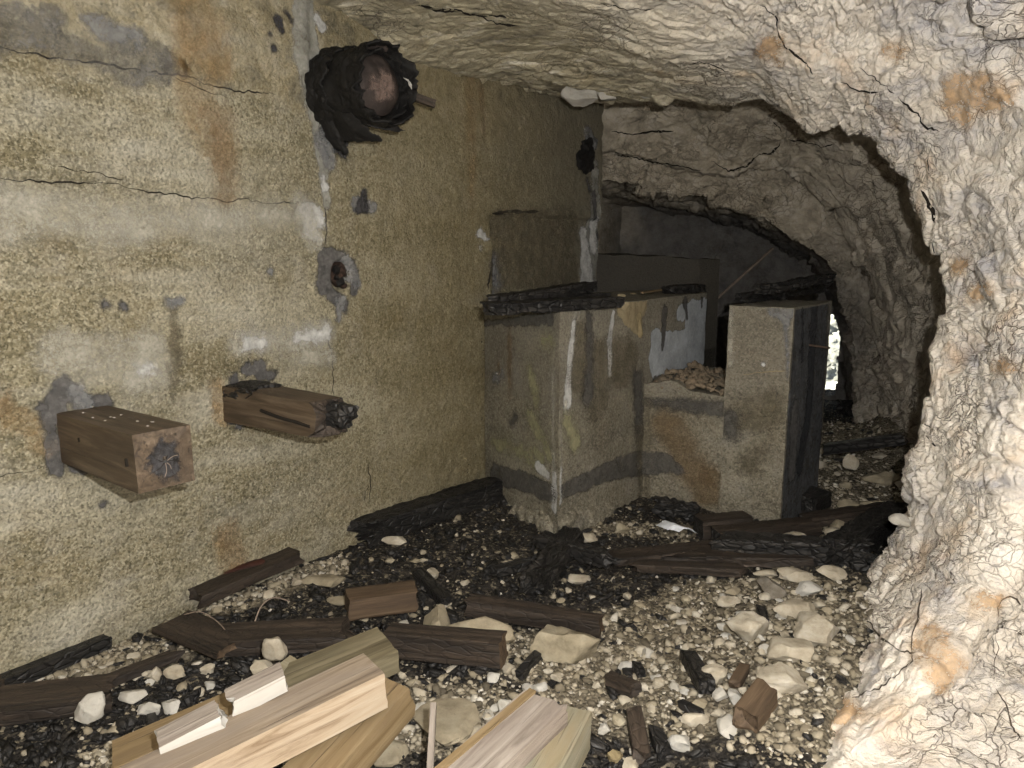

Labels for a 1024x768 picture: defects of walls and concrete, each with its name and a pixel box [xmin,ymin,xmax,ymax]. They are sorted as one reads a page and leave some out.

crack [758,4,813,75]
water stain [484,310,799,514]